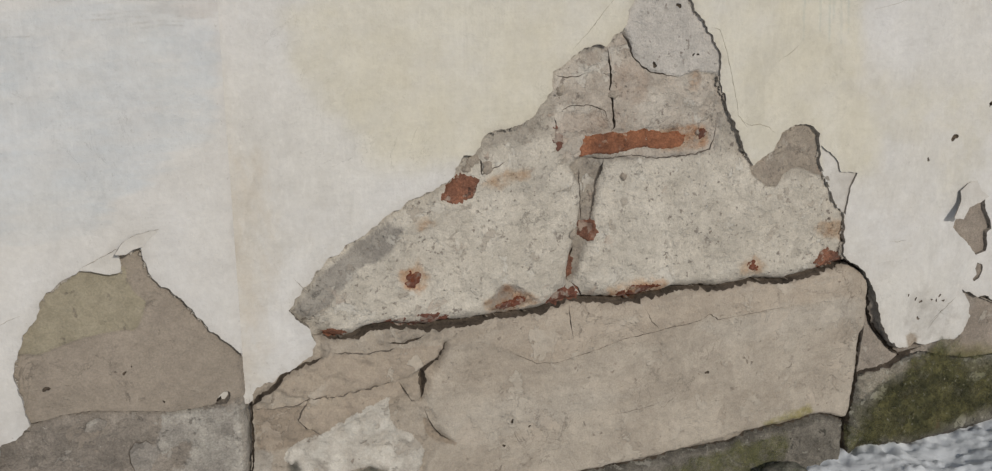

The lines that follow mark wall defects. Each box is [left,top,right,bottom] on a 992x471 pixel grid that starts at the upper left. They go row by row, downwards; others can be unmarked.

flaking render [290,0,856,338]
peeling [953,181,989,280]
crack [128,440,152,471]
flaking render [0,229,992,471]
crack [250,248,921,471]